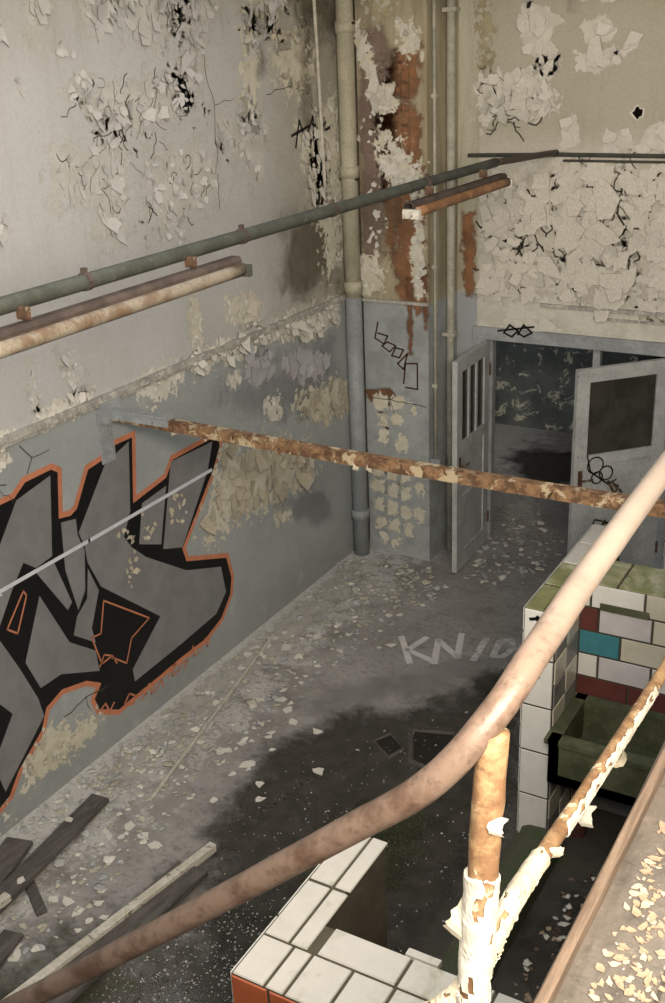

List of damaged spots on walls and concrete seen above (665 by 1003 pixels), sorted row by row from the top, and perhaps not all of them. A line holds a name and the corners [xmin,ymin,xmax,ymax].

peeling [0,0,342,264]
peeling [360,209,390,297]
peeling [354,0,430,202]
rust [373,42,429,355]
peeling [408,216,429,301]
peeling [469,0,665,333]
crack [0,445,49,503]
peeling [169,443,323,554]
damp [209,863,321,968]
damp [204,670,504,887]
damp [371,767,473,954]
damp [505,708,520,807]